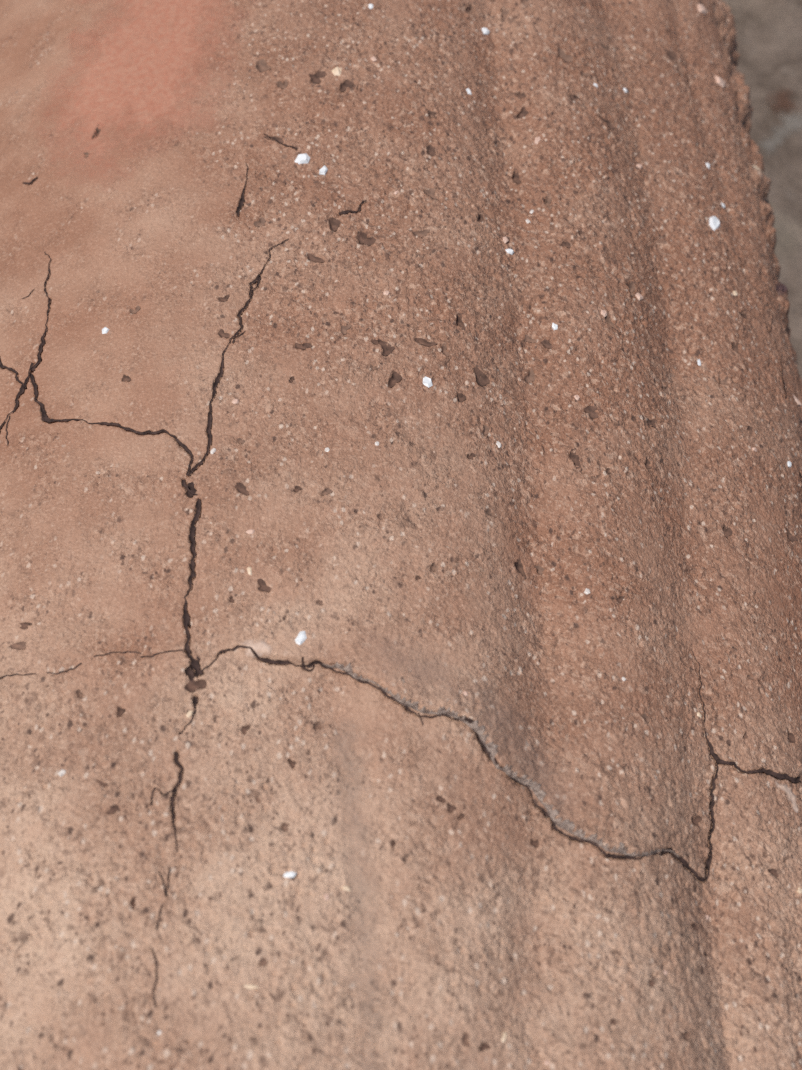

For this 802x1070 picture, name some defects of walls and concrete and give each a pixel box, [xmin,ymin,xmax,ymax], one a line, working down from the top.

crack [236,163,248,217]
crack [339,200,367,215]
crack [0,239,801,1007]